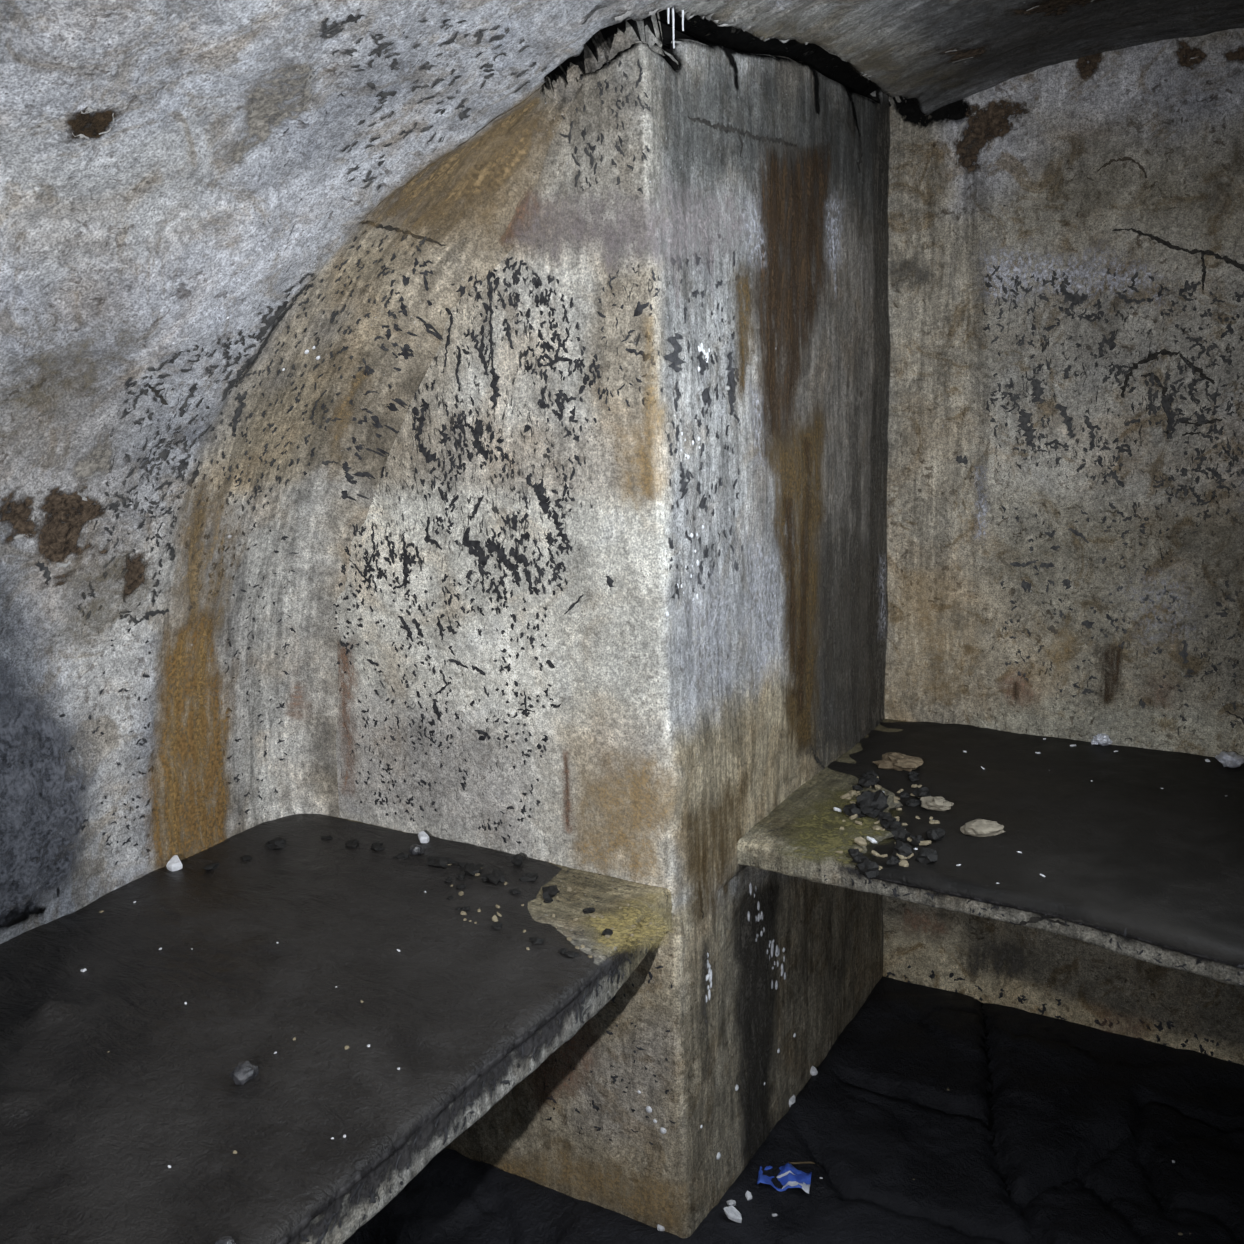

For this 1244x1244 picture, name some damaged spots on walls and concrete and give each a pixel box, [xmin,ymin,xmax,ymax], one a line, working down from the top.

flaking render [66,107,116,142]
peeling [319,14,530,191]
crack [688,116,797,210]
flaking render [511,0,1030,191]
efflorescence [984,252,1151,300]
crack [1112,228,1244,290]
leakage [790,102,929,771]
peeling [0,231,743,821]
rust [150,495,229,866]
peeling [101,795,153,852]
peeling [478,779,541,844]